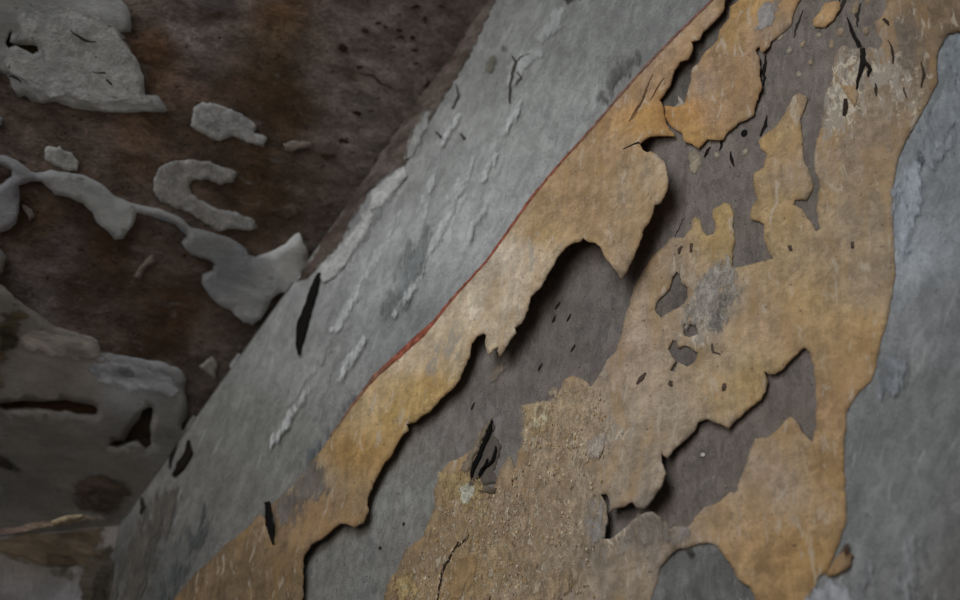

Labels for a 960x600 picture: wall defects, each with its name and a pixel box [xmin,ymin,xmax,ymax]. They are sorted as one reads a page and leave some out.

damp [0,311,29,354]
flaking render [0,0,488,441]
peeling [303,0,960,600]